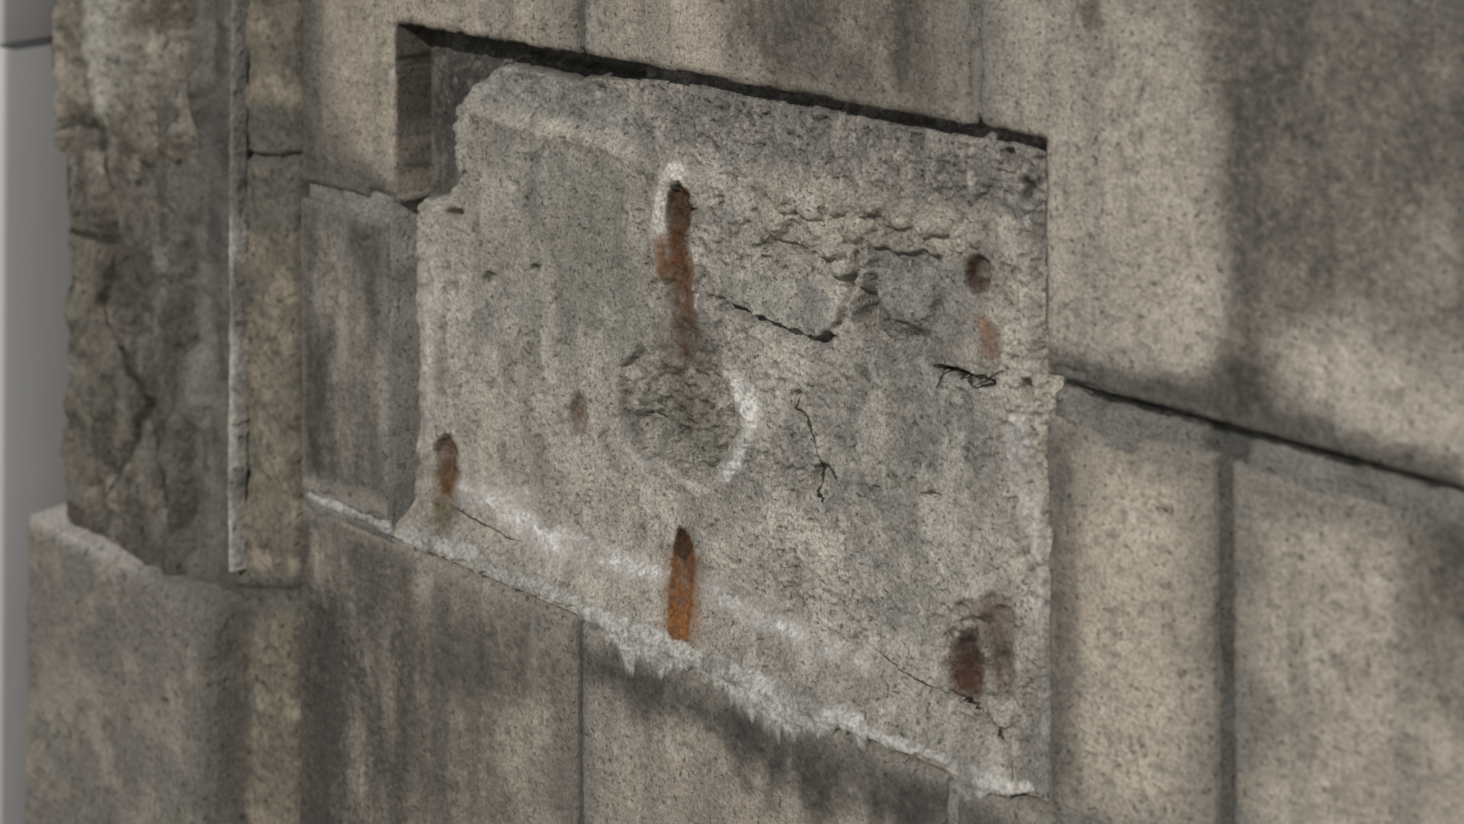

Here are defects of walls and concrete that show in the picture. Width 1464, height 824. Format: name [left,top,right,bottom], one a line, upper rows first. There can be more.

spalling [419,30,647,204]
rust [657,182,696,332]
water stain [299,484,1034,824]
spalling [614,315,745,491]
rust [667,526,698,643]
water stain [713,369,764,484]
crack [795,397,837,506]
crack [875,649,1019,781]
crack [931,364,1008,389]
rust [952,632,1001,697]
spalling [936,587,1034,739]
water stain [1006,409,1045,643]